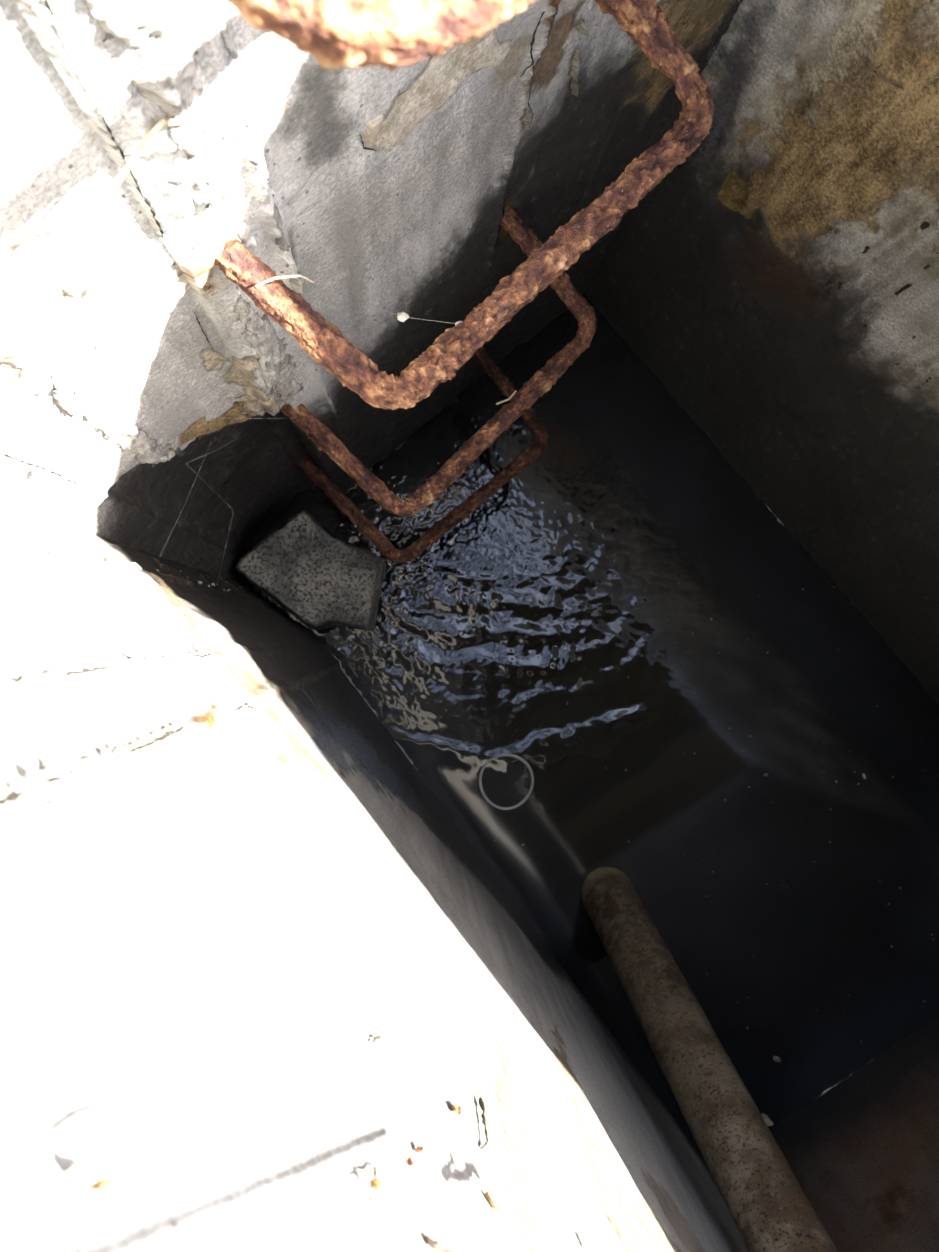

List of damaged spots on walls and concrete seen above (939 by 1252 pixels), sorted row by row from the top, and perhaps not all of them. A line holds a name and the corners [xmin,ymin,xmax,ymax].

crack [30,0,164,239]
rust [528,0,585,94]
leakage [630,46,673,114]
leakage [658,0,939,257]
crack [59,665,115,676]
crack [0,768,73,809]
crack [119,727,185,756]
leakage [552,1027,681,1252]